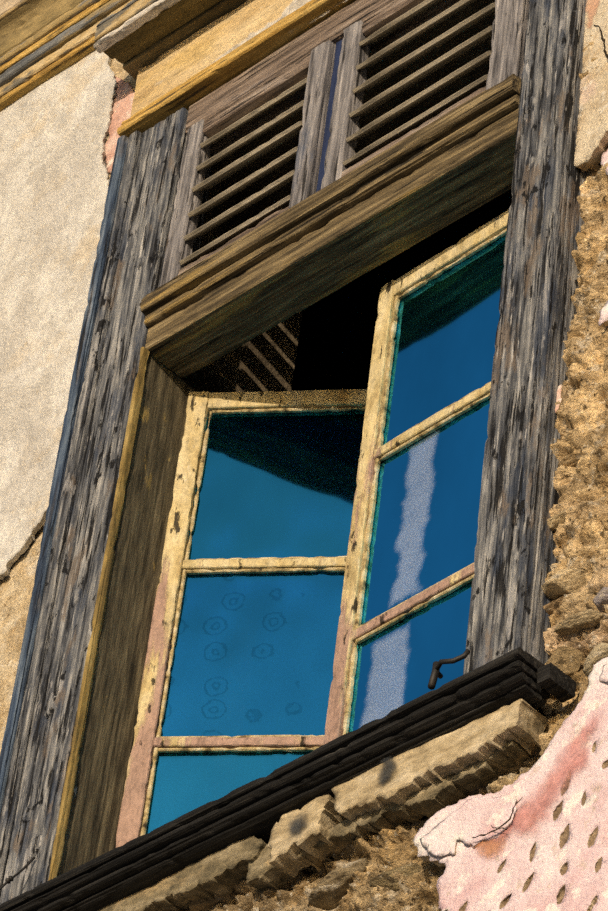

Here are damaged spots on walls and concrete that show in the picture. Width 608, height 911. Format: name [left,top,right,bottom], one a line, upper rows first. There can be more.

crack [593,25,608,62]
flaking render [105,58,136,177]
peeling [183,145,608,911]
flaking render [0,517,46,753]
crack [472,797,523,838]